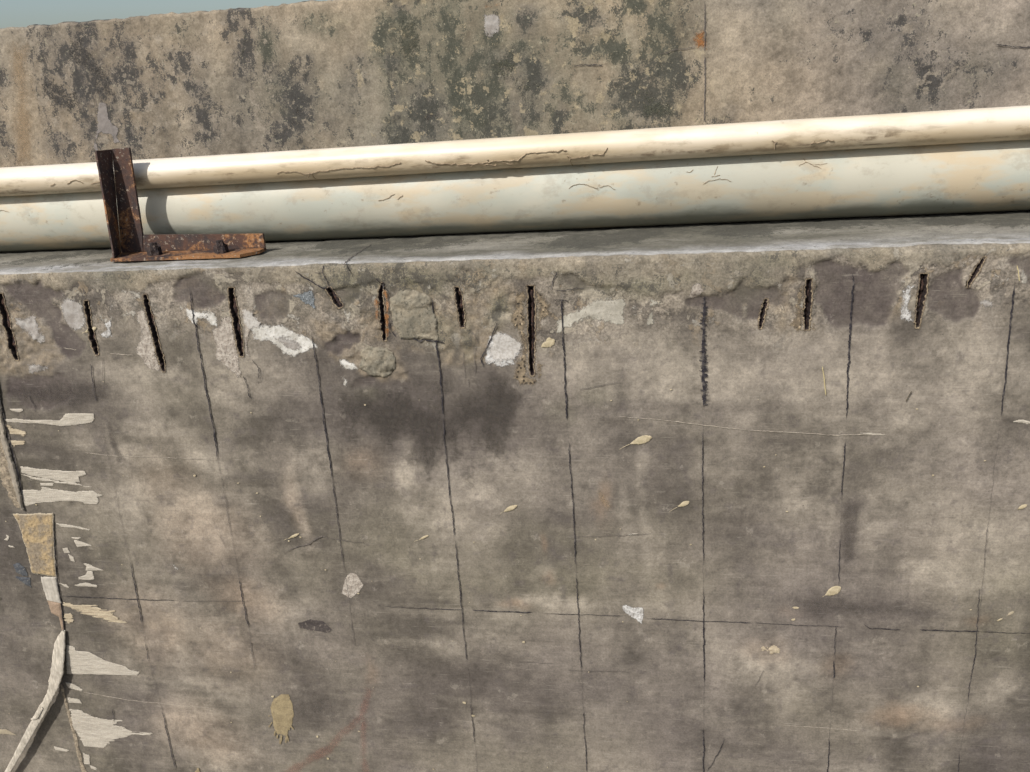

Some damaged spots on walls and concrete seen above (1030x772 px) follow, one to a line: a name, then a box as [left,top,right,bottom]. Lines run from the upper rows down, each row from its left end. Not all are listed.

damp [42,78,78,114]
damp [69,38,118,111]
peeling [15,315,45,343]
peeling [61,298,85,330]
spalling [136,310,167,371]
spalling [212,316,252,377]
peeling [485,291,626,384]
damp [345,383,515,464]
spalling [0,437,20,508]
crack [387,272,645,771]
crack [647,277,855,772]